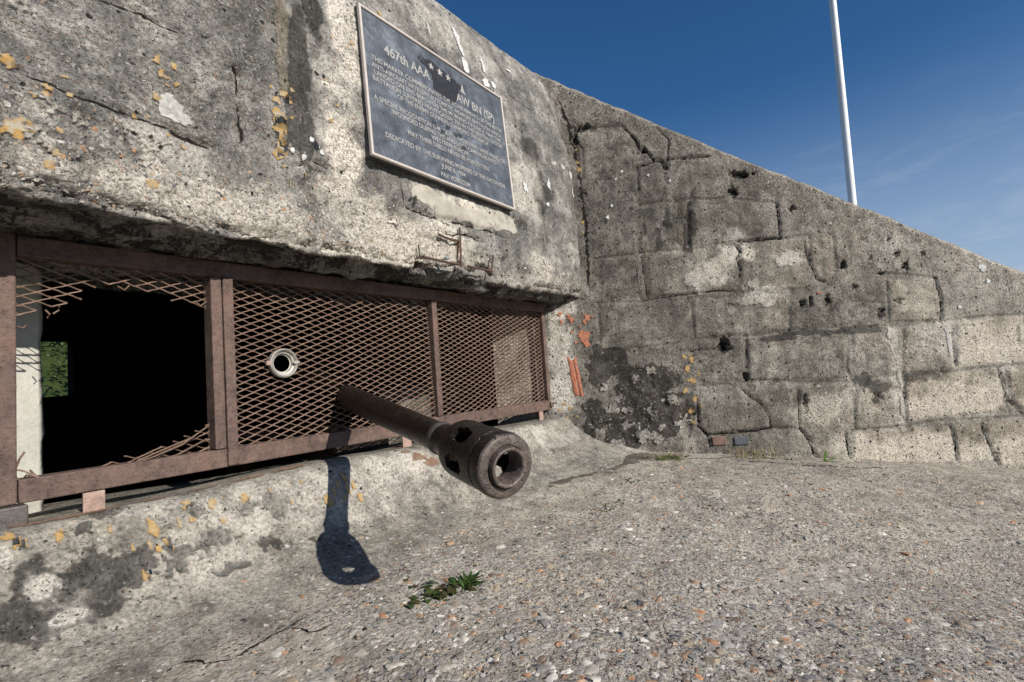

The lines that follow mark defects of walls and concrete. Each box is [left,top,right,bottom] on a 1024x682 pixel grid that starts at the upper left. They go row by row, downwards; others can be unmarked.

crack [6,68,210,149]
crack [232,66,243,147]
leakage [273,0,324,172]
crack [519,94,591,294]
leakage [186,501,208,518]
leakage [237,489,290,552]
leakage [0,504,244,649]
leakage [213,560,252,575]
crack [182,616,334,664]